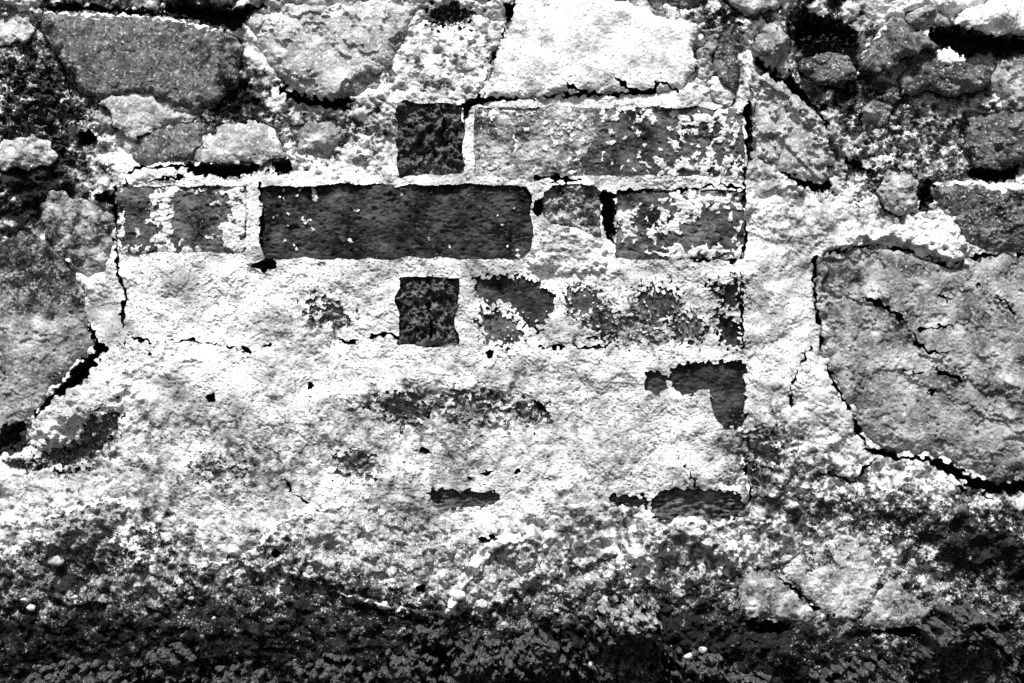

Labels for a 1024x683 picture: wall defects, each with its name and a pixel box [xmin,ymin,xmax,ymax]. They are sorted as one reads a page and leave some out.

peeling [480,106,588,175]
peeling [599,106,744,177]
peeling [115,184,247,254]
peeling [279,187,319,231]
flaking render [471,189,792,487]
crack [787,244,1024,483]
flaking render [426,487,500,514]
flaking render [604,487,745,525]
crack [953,485,993,500]